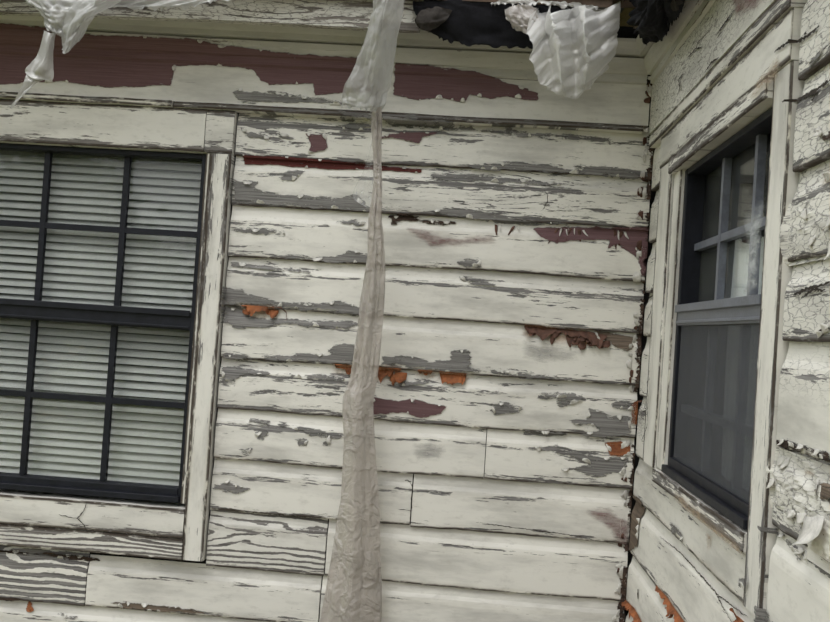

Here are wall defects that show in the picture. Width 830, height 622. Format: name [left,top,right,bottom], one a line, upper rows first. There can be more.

crack [774,26,819,53]
peeling [0,23,372,131]
peeling [393,63,538,103]
crack [644,75,653,103]
crack [677,47,719,95]
crack [782,79,830,102]
peeling [243,132,639,186]
peeling [229,178,370,226]
peeling [388,207,649,276]
peeling [220,286,359,329]
crack [476,128,654,622]
peeling [373,397,447,418]